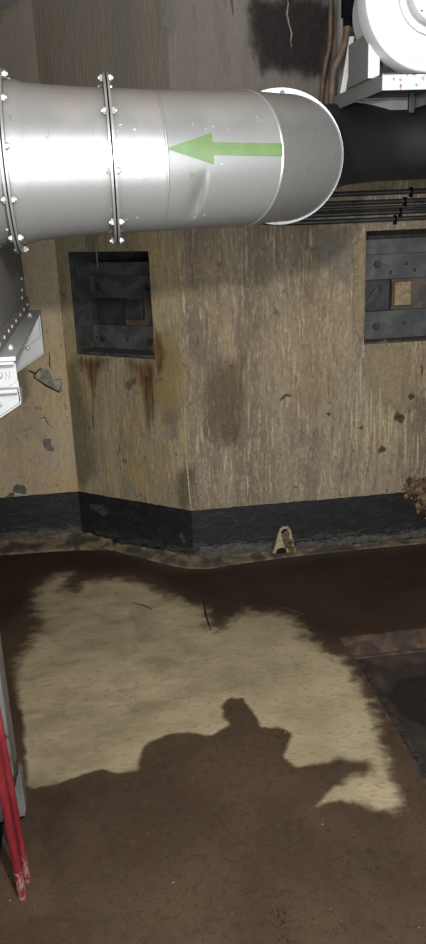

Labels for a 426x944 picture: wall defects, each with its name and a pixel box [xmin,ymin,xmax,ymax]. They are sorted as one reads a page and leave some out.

corrosion [130,335,164,418]